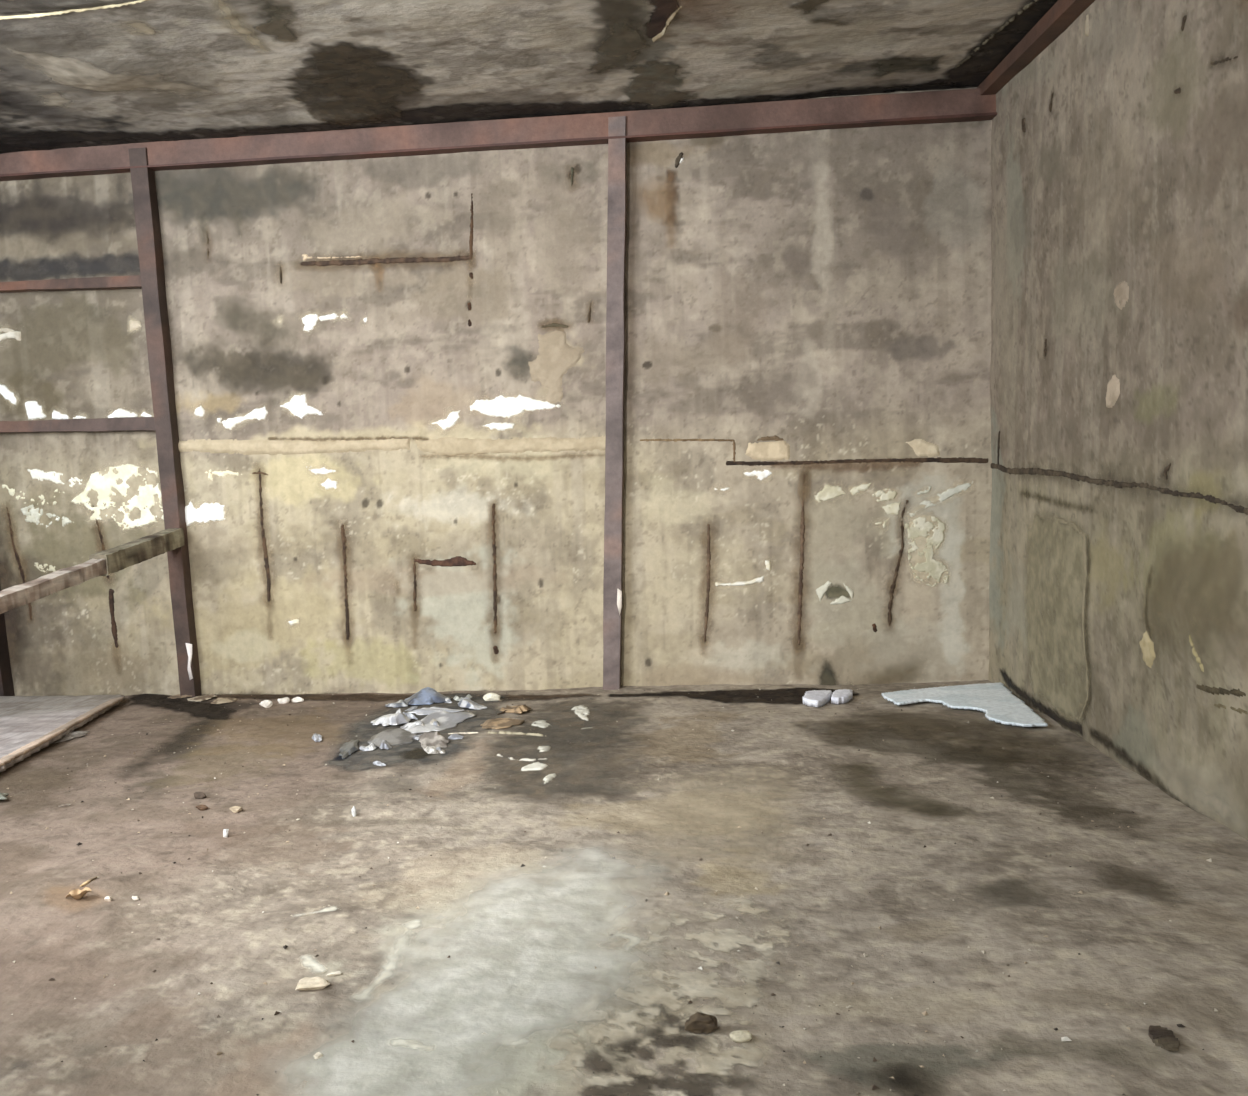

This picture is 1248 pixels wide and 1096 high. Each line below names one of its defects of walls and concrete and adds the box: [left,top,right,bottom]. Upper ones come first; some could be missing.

leakage [254,0,296,42]
leakage [287,42,422,126]
leakage [0,254,140,280]
rust [300,193,473,279]
peeling [431,394,561,431]
peeling [2,464,164,530]
rust [252,469,271,602]
rust [413,556,476,614]
rust [491,503,499,654]
crack [872,500,908,632]
peeling [814,481,973,587]
crack [640,431,1248,515]